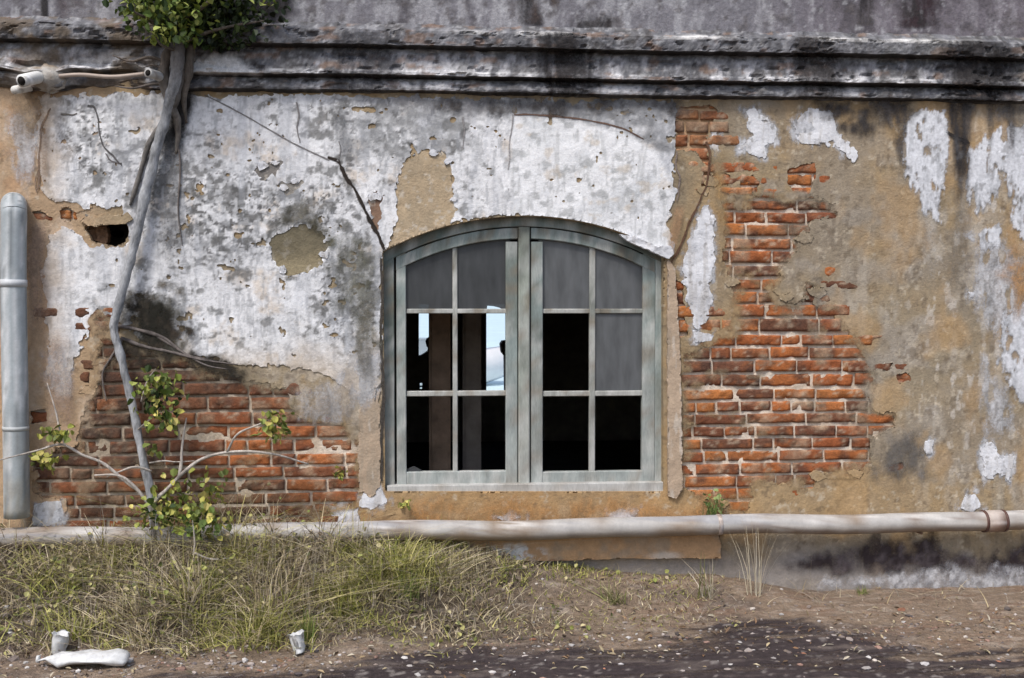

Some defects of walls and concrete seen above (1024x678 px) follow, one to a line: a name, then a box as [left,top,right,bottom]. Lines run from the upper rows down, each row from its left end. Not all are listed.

spalling [33,203,133,246]
crack [204,95,385,481]
peeling [269,224,329,278]
peeling [368,149,458,248]
crack [508,113,644,170]
flaking render [675,105,911,514]
peeling [901,108,949,222]
peeling [966,122,1024,430]
flaking render [30,308,387,527]
leakage [874,433,925,479]
peeling [961,439,1016,512]
leakage [798,532,1024,589]